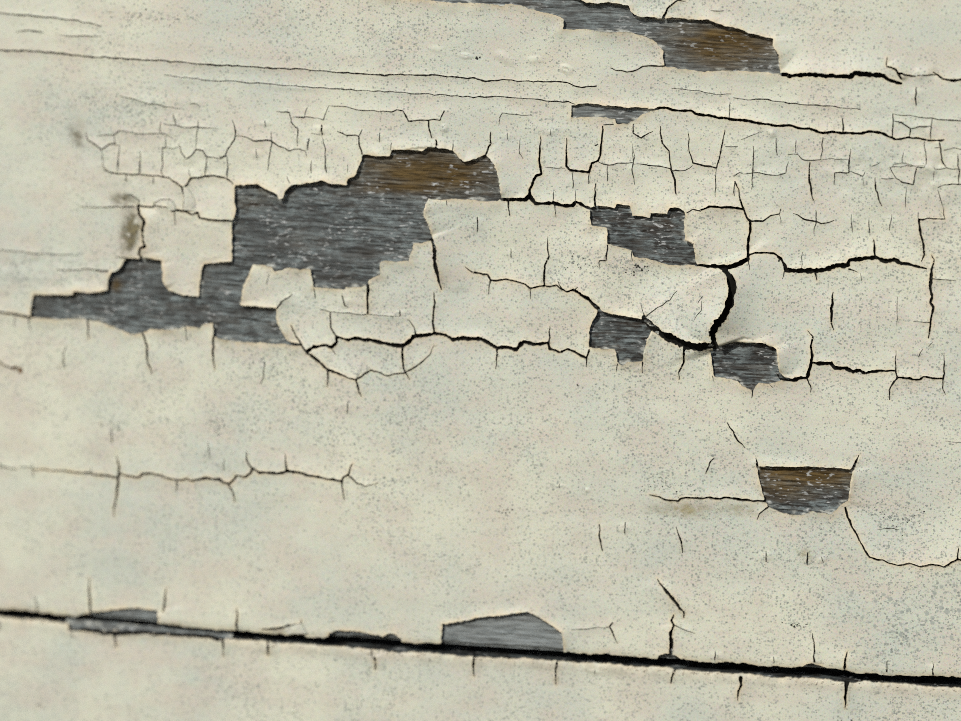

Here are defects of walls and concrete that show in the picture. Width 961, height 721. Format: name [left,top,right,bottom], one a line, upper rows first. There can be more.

peeling [426,0,788,77]
peeling [30,142,824,390]
crack [0,430,378,516]
peeling [757,463,856,515]
crack [845,507,961,567]
peeling [66,607,317,650]
peeling [329,630,401,640]
peeling [441,612,564,660]